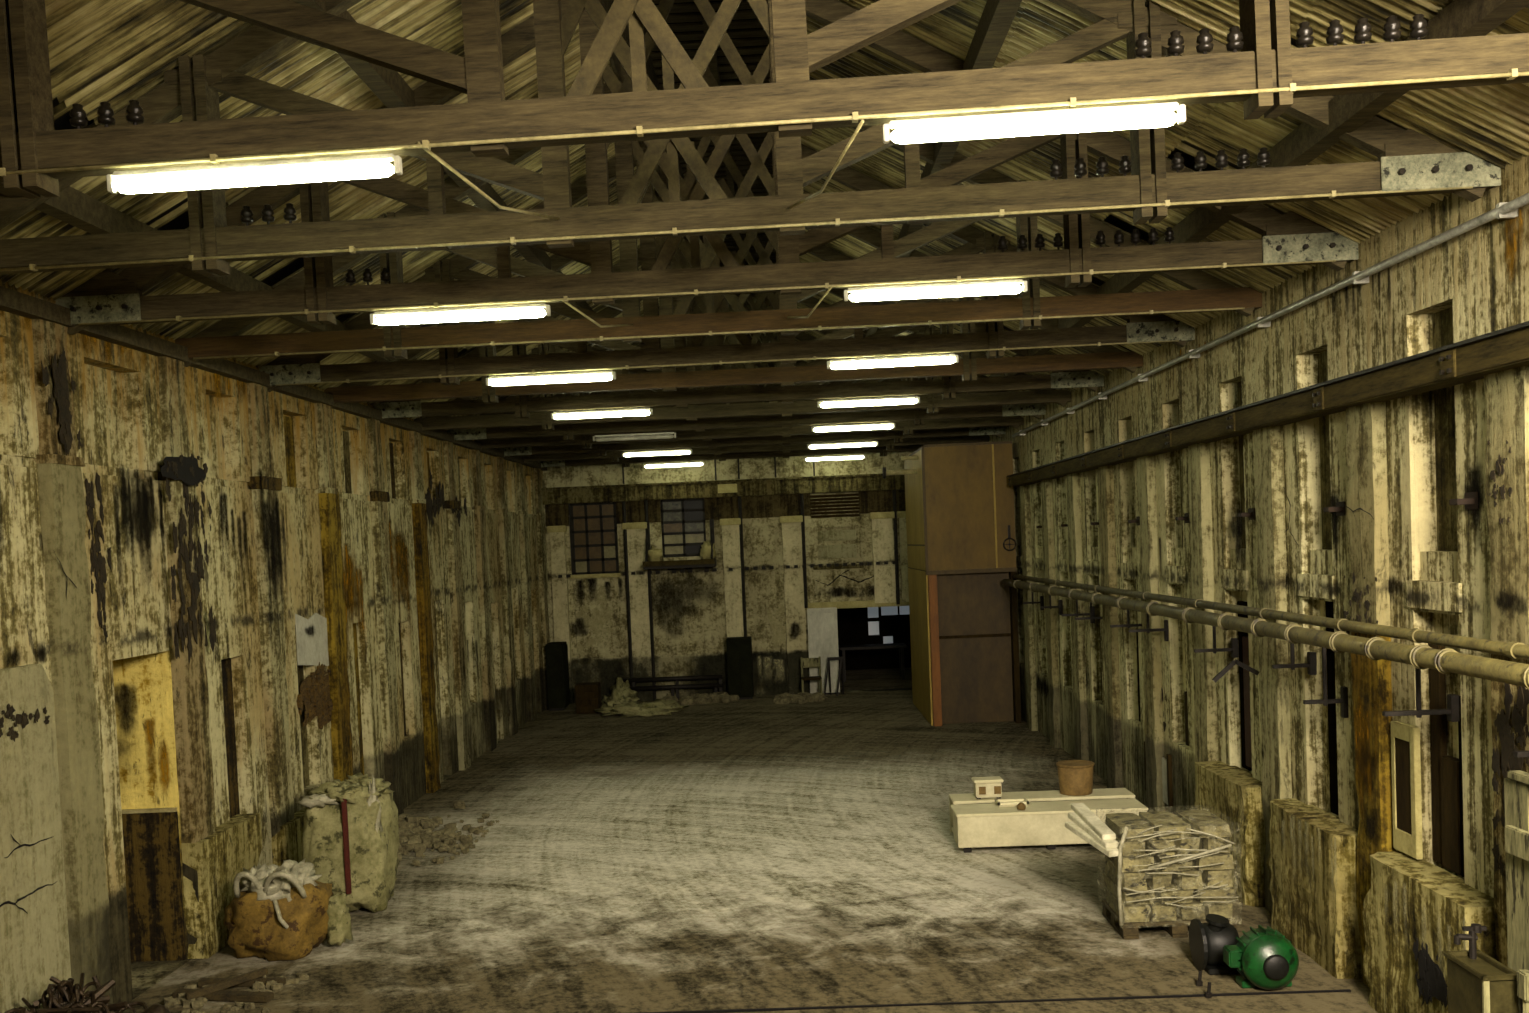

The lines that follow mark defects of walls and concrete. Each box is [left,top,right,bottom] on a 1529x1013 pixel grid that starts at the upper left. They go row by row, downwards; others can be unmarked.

water stain [114,467,164,572]
spalling [0,704,50,742]
crack [5,835,54,858]
crack [0,882,56,914]